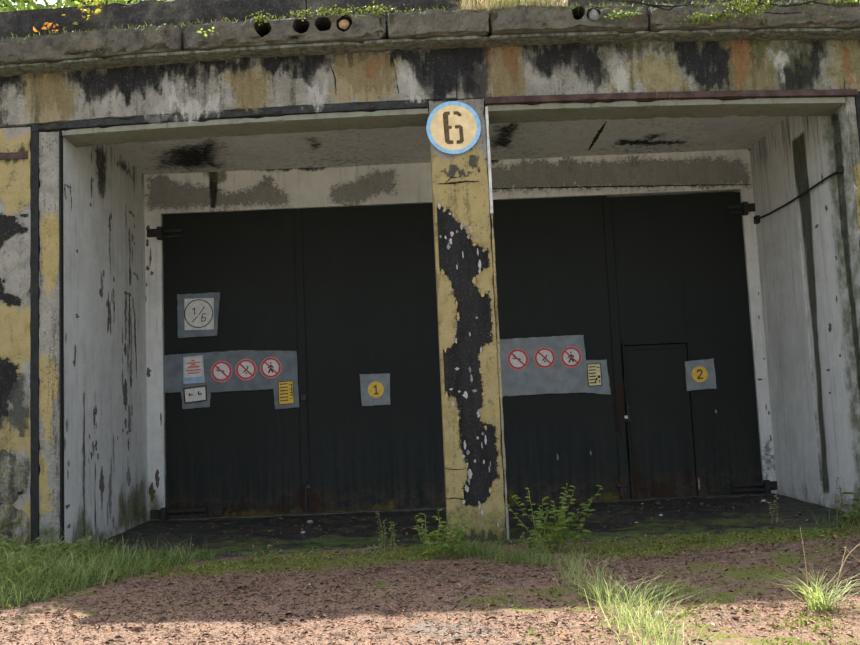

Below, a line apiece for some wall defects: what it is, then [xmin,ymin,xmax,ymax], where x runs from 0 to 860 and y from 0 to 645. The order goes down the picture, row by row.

leakage [72,55,331,123]
leakage [390,47,483,103]
leakage [521,42,629,92]
leakage [674,41,732,91]
corrosion [730,40,776,91]
leakage [768,40,824,98]
peeling [0,213,29,248]
peeling [0,278,22,307]
peeling [0,357,19,417]
peeling [88,205,154,529]
peeling [437,203,500,516]
leakage [83,392,95,533]